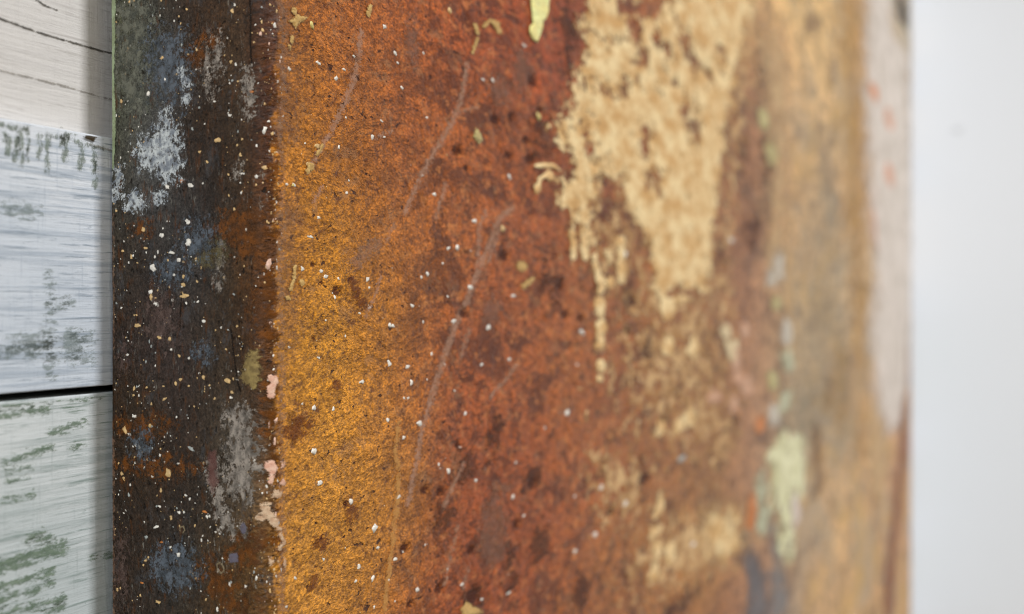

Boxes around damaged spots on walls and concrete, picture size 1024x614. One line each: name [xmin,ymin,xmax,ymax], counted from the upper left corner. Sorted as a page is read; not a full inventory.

rust [526,0,581,162]
rust [206,136,283,345]
rust [347,276,368,308]
peeling [504,0,809,614]
rust [112,408,208,484]
rust [192,374,315,614]
rust [311,533,328,551]
rust [433,403,505,530]
rust [529,522,555,570]
rust [566,567,600,614]